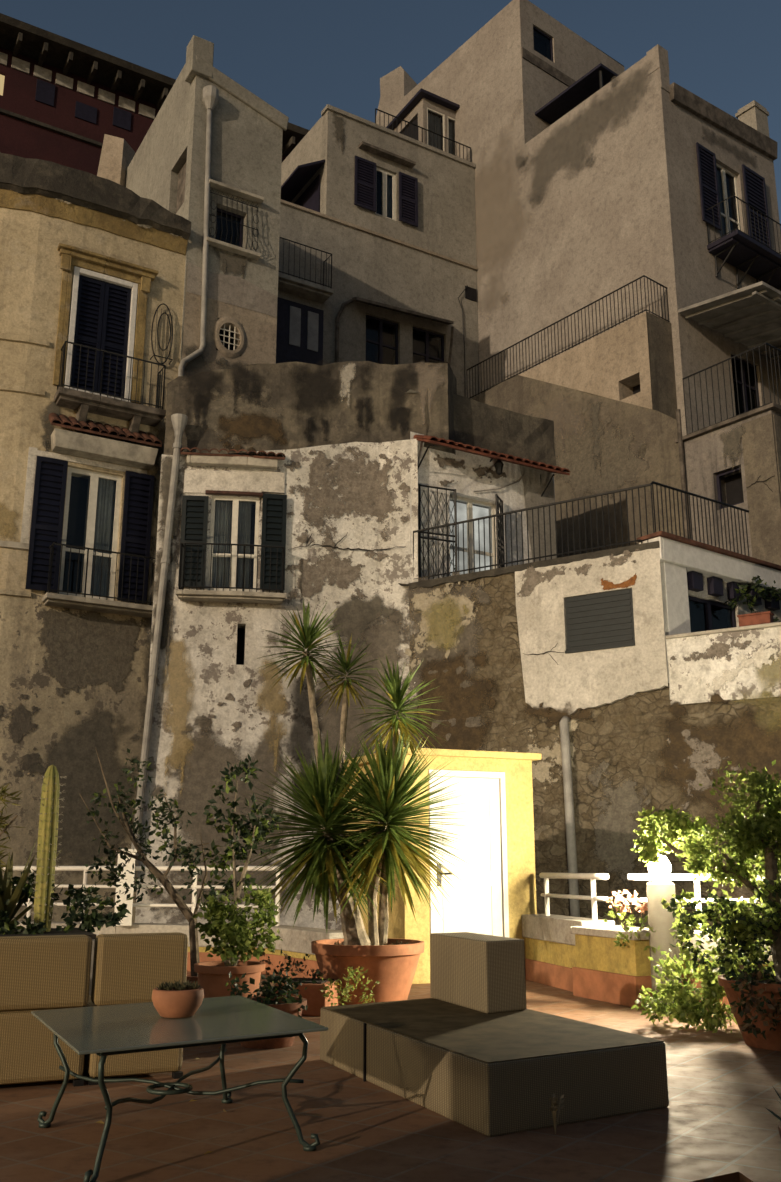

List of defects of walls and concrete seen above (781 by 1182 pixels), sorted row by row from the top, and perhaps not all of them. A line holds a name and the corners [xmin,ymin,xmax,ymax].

water stain [475,71,646,265]
water stain [184,346,260,427]
water stain [294,363,444,447]
crack [288,532,406,551]
flaking render [285,446,410,603]
flaking render [513,549,639,597]
peeling [38,608,143,697]
peeling [313,572,490,763]
flaking render [670,635,779,691]
peeling [0,694,139,866]
peeling [147,693,292,919]